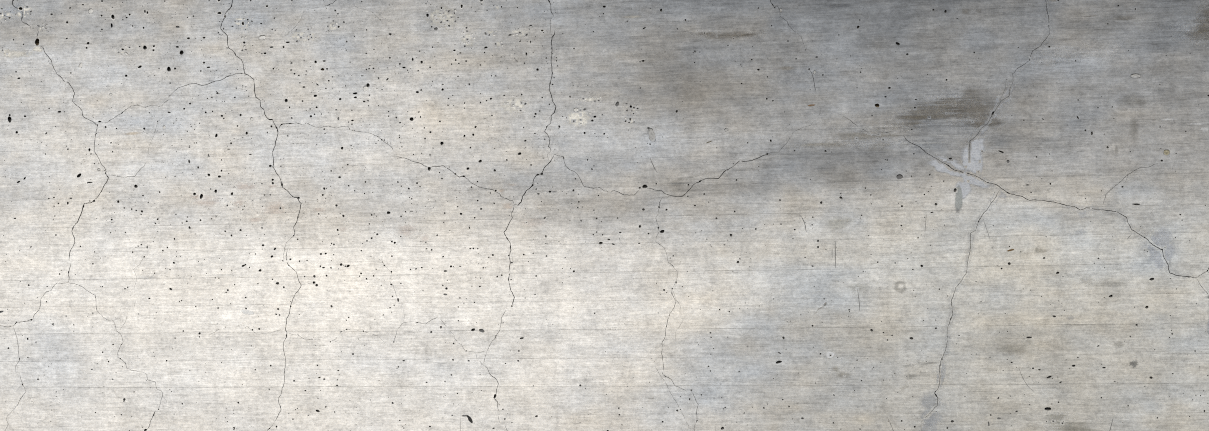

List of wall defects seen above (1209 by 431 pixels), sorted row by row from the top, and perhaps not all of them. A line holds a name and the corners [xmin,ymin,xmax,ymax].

crack [4,0,820,431]
crack [845,6,1209,421]